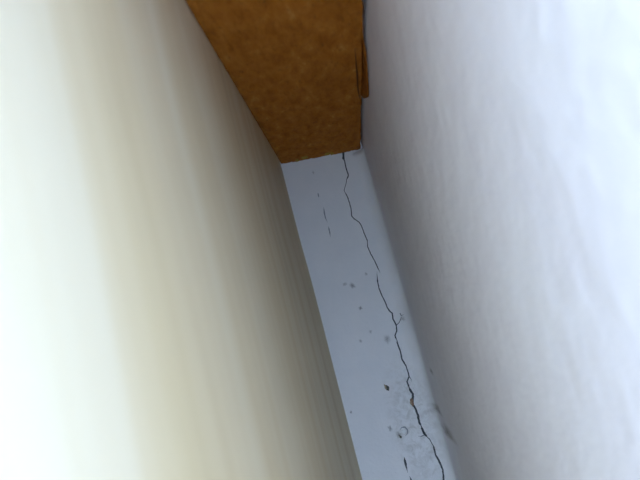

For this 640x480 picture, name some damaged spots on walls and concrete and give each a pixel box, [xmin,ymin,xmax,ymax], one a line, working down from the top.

crack [342,153,444,480]